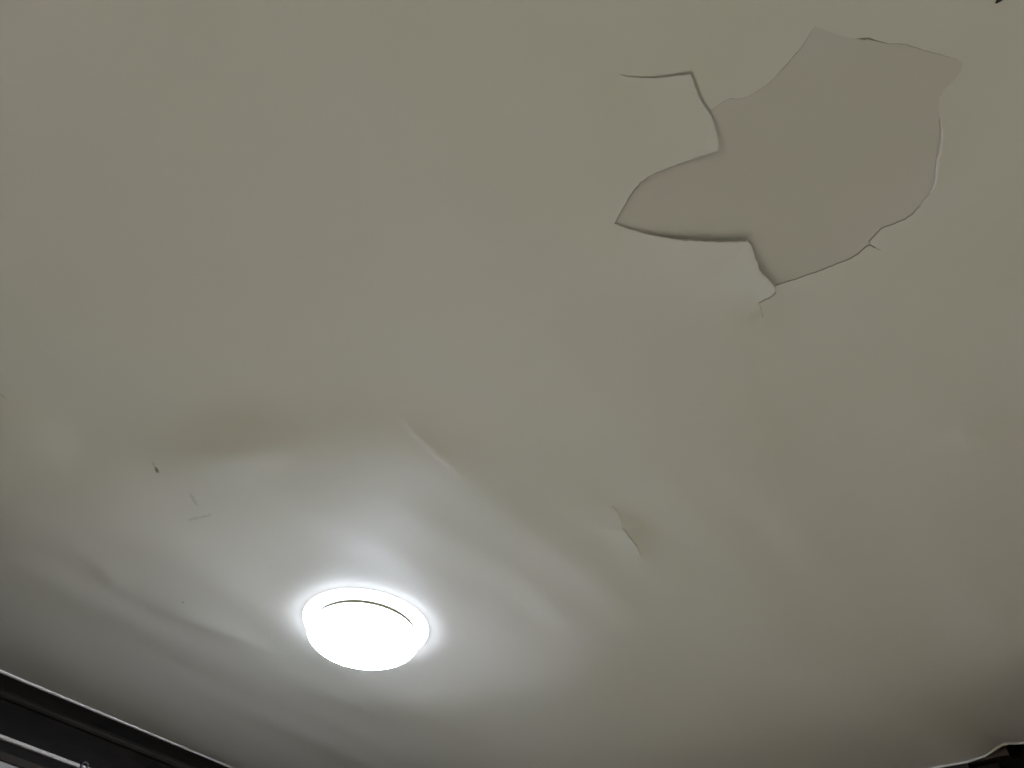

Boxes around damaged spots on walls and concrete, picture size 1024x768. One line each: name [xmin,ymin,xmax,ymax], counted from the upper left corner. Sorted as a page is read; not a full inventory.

peeling [603,26,963,324]